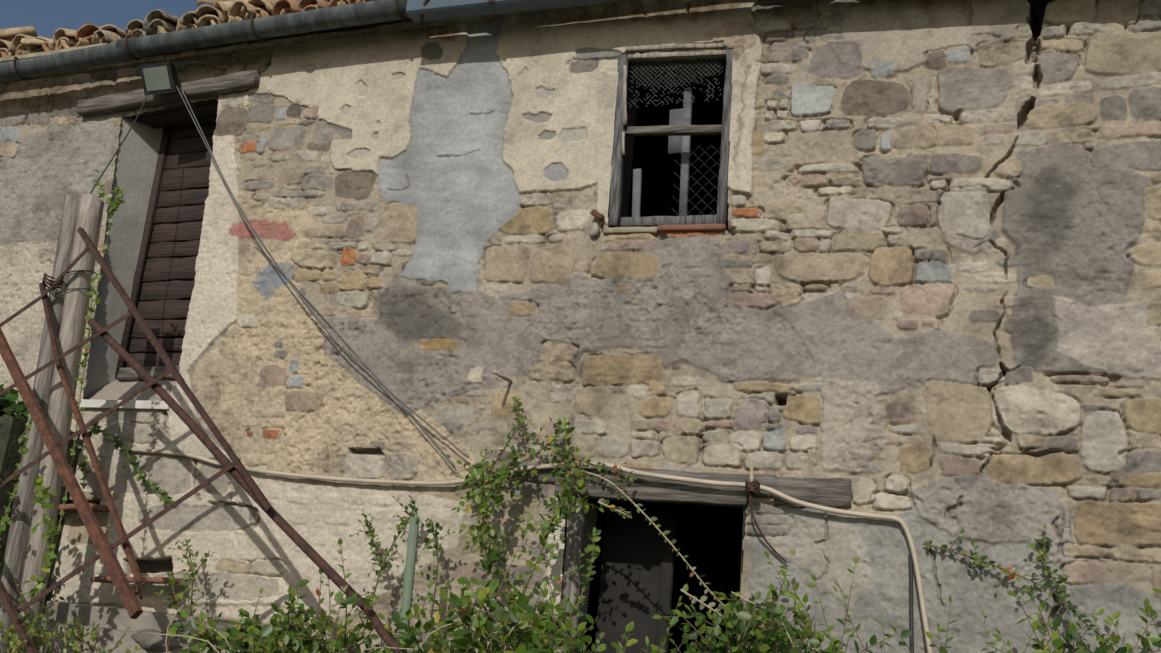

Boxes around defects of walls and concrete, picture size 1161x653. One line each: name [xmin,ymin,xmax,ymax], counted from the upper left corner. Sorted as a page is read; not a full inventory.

flaking render [211,19,588,291]
spalling [751,0,841,152]
spalling [570,366,824,468]
crack [925,0,1081,607]